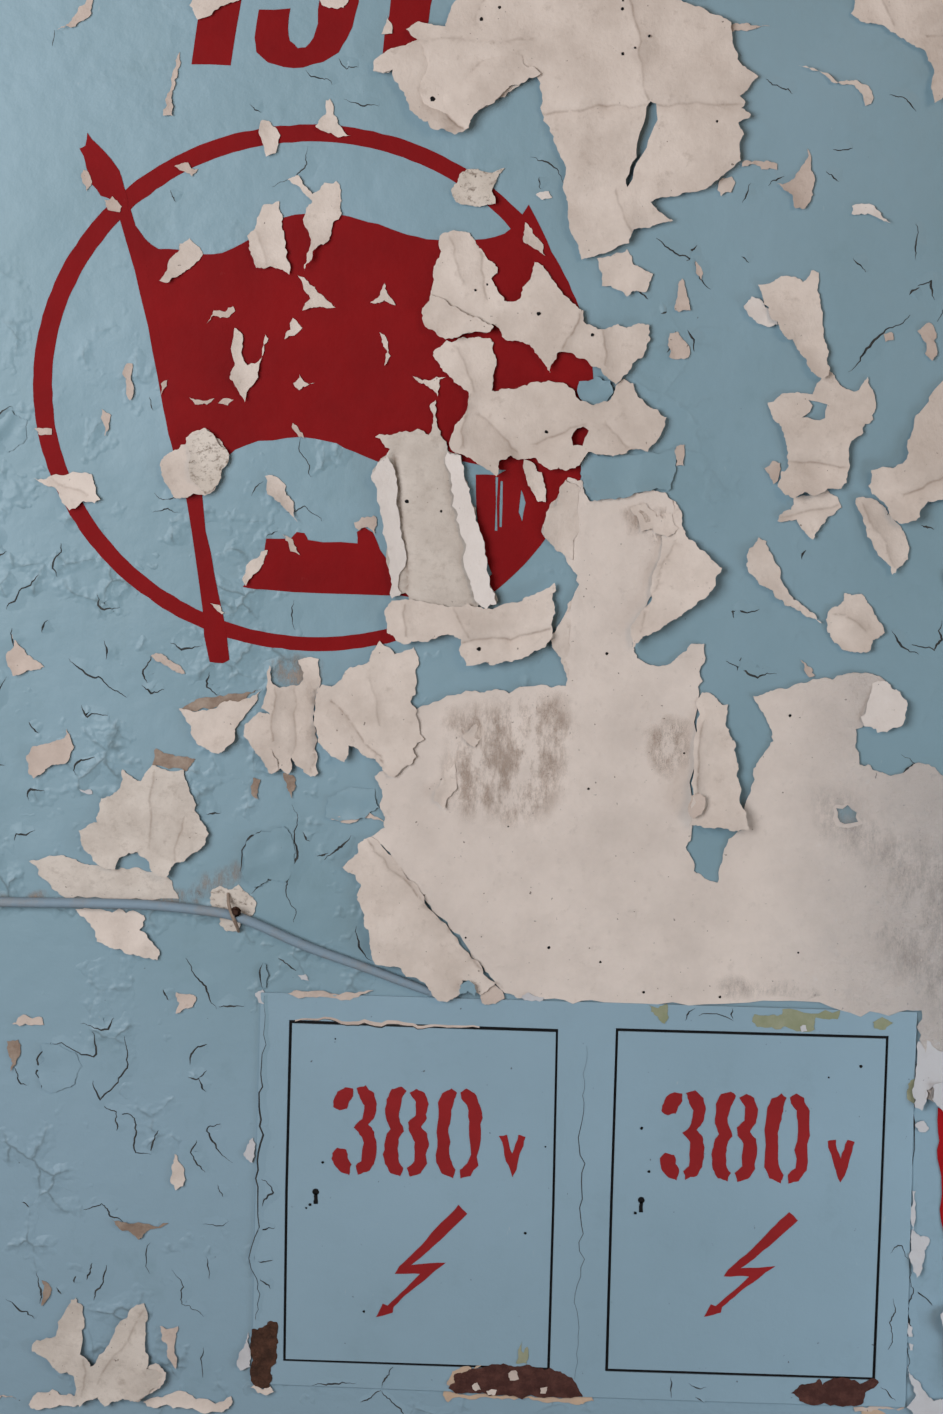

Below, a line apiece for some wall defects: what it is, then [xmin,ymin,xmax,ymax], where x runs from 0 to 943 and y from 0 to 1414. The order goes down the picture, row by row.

peeling [190,0,239,20]
peeling [851,0,943,102]
peeling [259,120,280,156]
peeling [373,0,815,296]
peeling [247,175,342,339]
flaking render [75,222,943,1132]
crack [204,798,221,815]
crack [6,802,480,1378]
peeling [0,1298,178,1410]
corrosion [250,1321,278,1395]
corrosion [443,1343,593,1405]
corrosion [792,1377,904,1414]